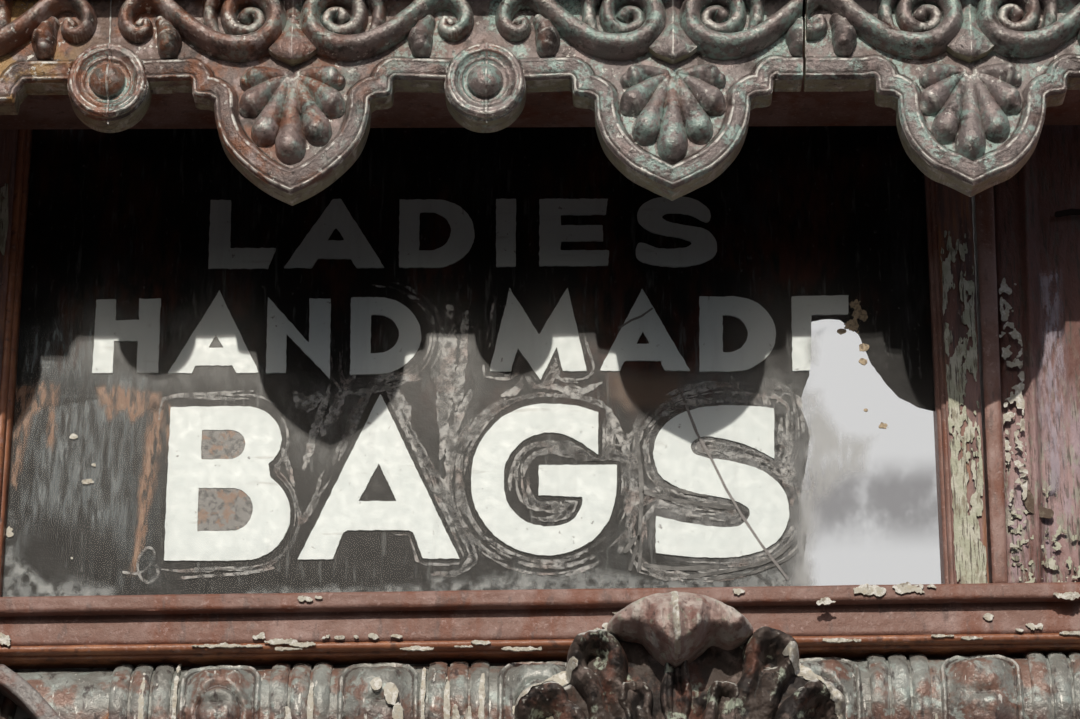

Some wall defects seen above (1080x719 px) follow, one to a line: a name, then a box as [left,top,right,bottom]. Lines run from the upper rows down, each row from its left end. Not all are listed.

peeling [940,230,988,584]
peeling [999,278,1080,601]
peeling [816,597,836,606]
peeling [853,582,936,597]
peeling [192,632,434,652]
peeling [454,640,542,652]
peeling [1015,623,1043,632]
peeling [171,664,181,719]
peeling [370,677,404,719]
peeling [443,673,485,719]
peeling [512,656,578,714]
peeling [782,641,847,719]